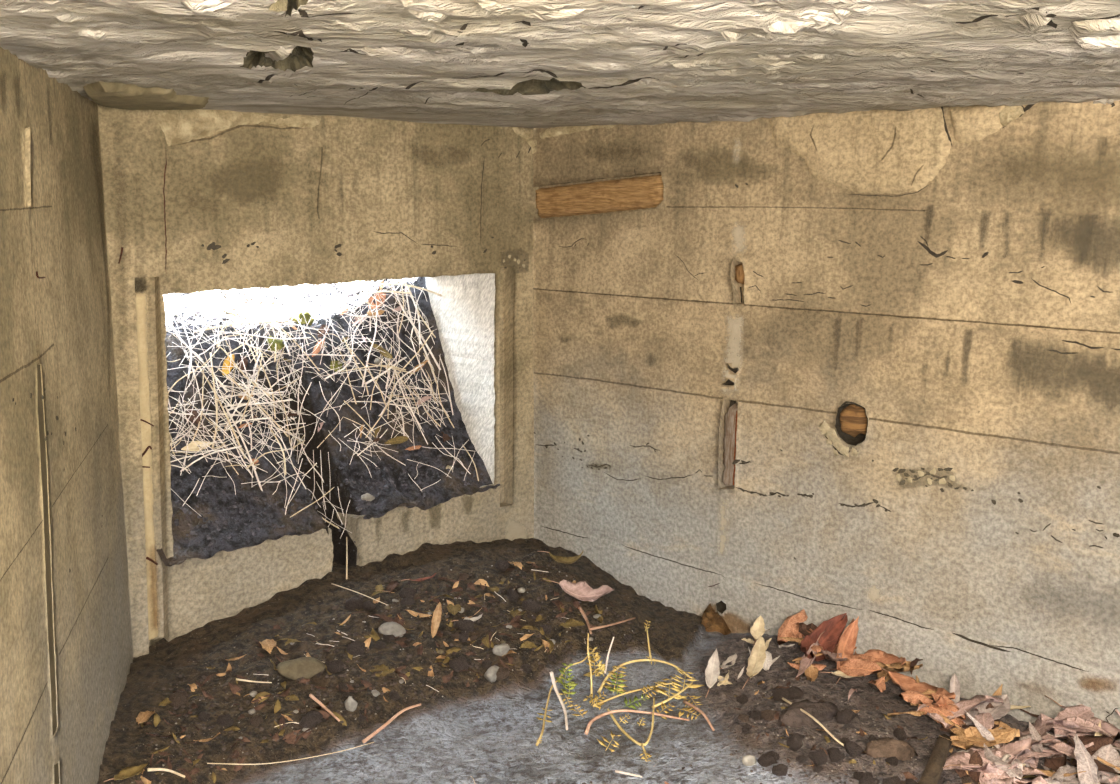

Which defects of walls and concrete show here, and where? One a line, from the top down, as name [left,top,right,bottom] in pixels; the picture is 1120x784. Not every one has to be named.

flaking render [240,0,498,86]
flaking render [461,0,878,101]
damp [980,214,988,240]
damp [1061,217,1120,274]
damp [1012,340,1120,404]
flaking render [896,467,955,485]